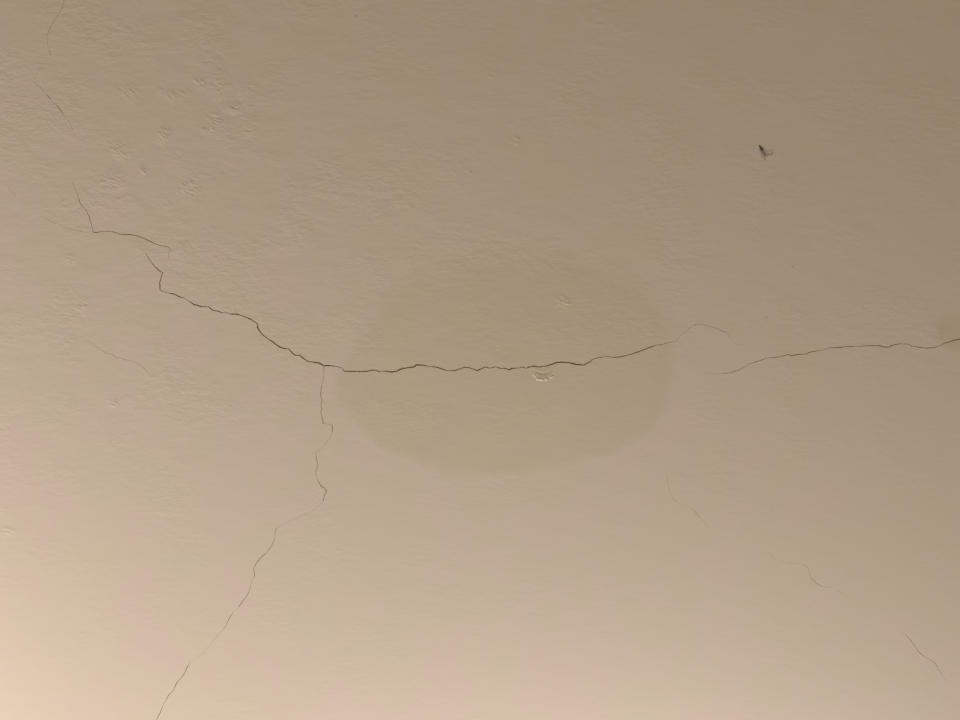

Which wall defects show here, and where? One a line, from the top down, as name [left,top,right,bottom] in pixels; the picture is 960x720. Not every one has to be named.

crack [41,189,960,720]
damp [328,249,681,482]